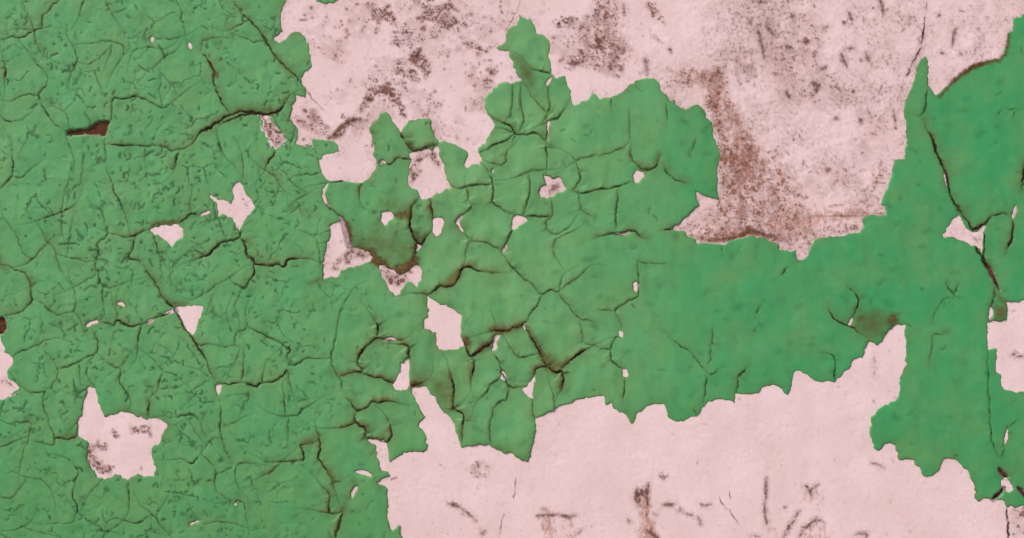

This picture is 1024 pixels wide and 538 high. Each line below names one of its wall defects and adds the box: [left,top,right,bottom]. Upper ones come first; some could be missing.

crack [110,55,284,163]
peeling [201,182,255,230]
peeling [257,0,1024,260]
corrosion [674,69,858,242]
crack [923,92,1014,303]
peeling [78,387,168,480]
crack [45,209,298,416]
crack [331,323,417,442]
peeling [424,297,464,350]
crack [452,289,625,426]
peeling [351,324,1024,538]
peeling [987,300,1024,393]